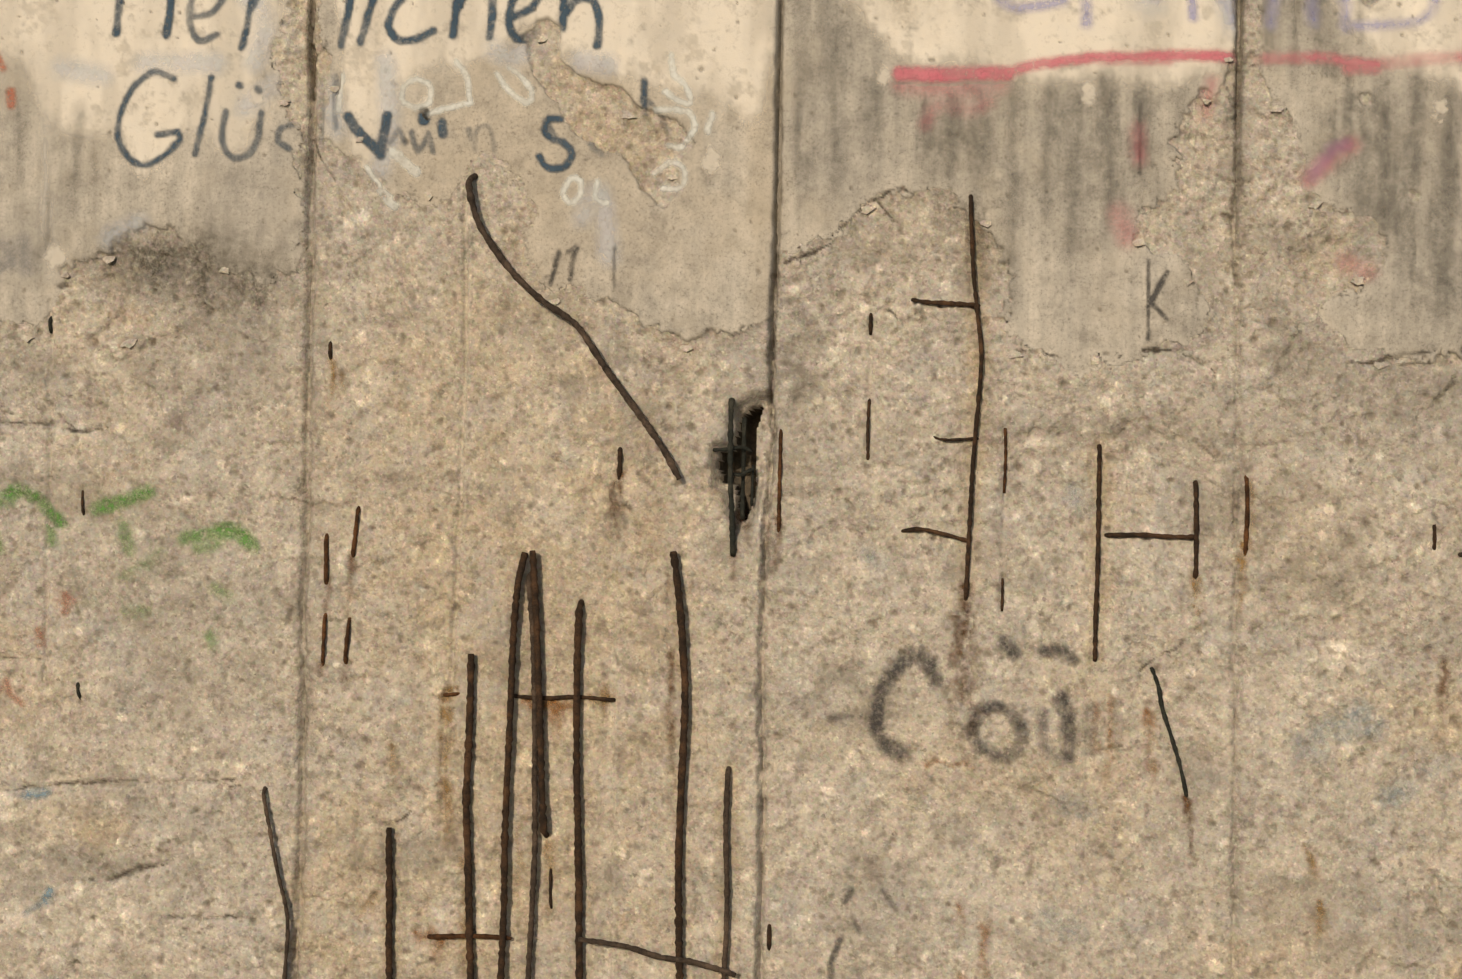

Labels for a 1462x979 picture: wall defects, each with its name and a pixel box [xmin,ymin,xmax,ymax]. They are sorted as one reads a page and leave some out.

spalling [0,0,776,979]
spalling [760,0,1462,979]